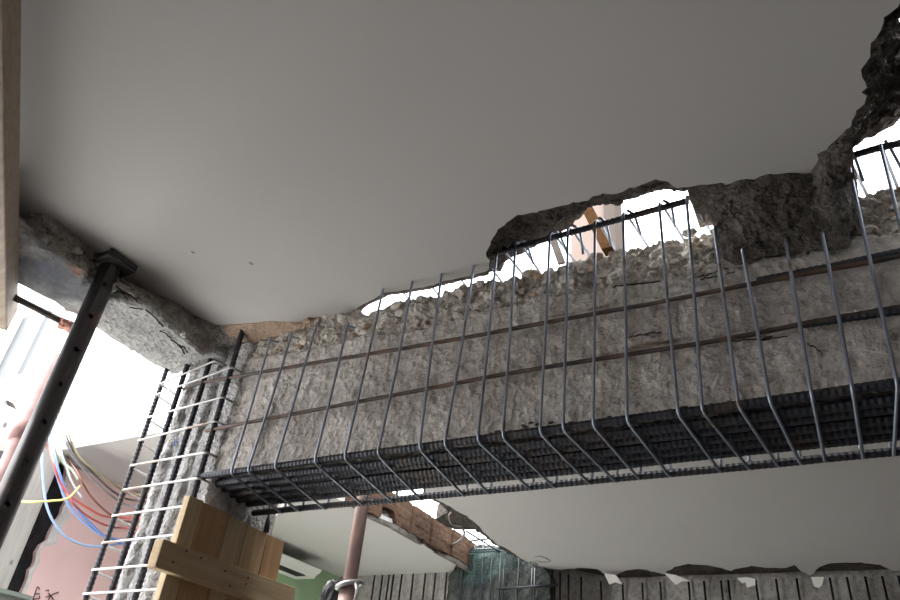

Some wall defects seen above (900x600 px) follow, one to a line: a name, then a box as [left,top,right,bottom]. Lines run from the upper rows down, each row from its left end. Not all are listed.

spalling [117,4,900,360]
spalling [19,213,100,283]
crack [116,285,188,355]
spalling [431,499,569,600]
spalling [370,572,448,600]
flaking render [600,573,624,600]
flaking render [659,573,691,600]
spalling [720,577,759,600]
flaking render [811,577,835,600]